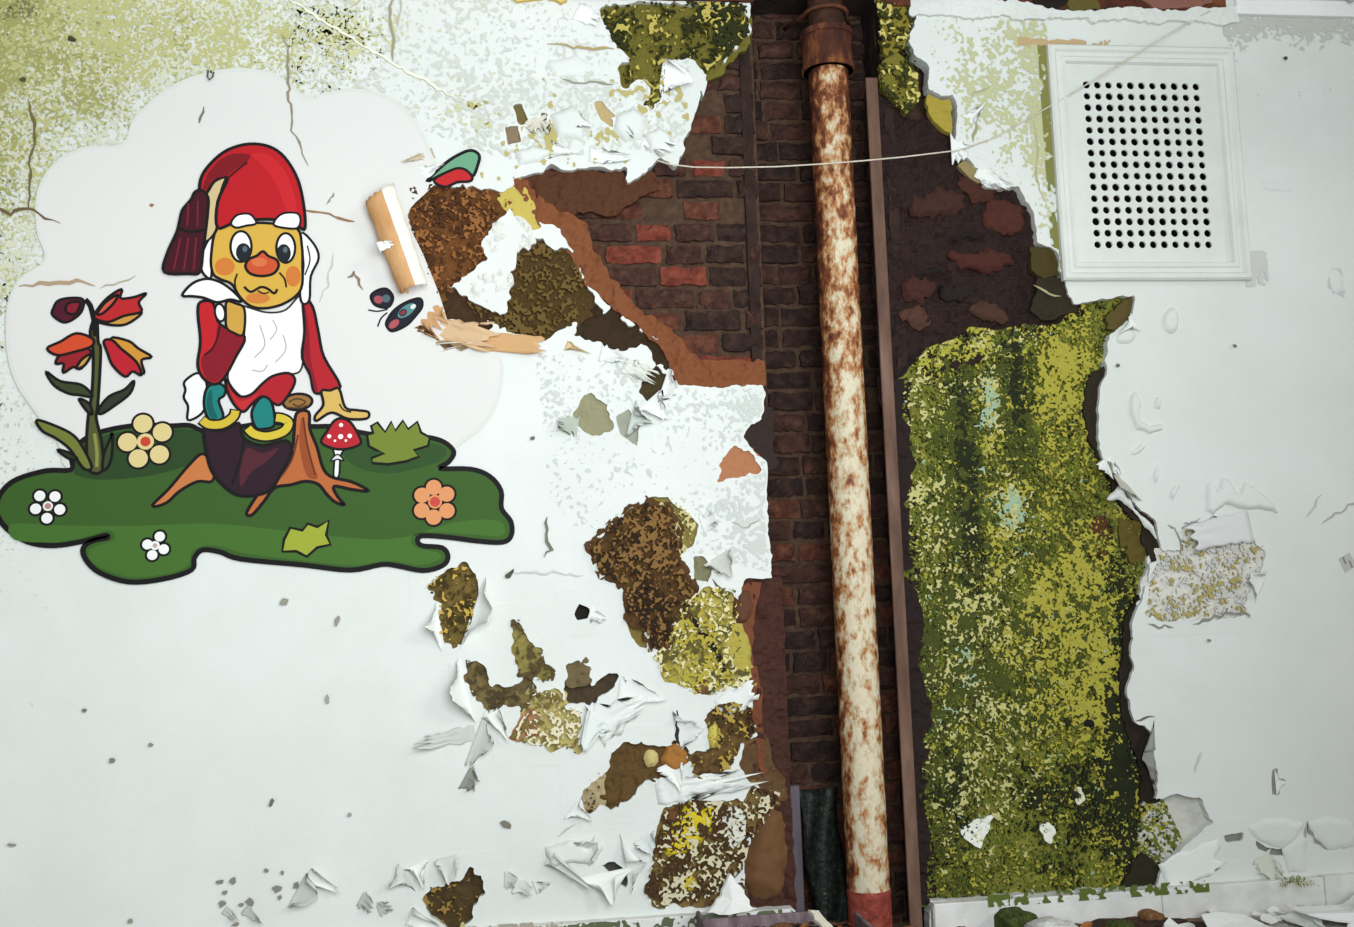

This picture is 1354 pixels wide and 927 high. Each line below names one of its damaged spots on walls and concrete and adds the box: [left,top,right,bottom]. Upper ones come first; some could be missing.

mould [0,0,46,36]
flaking render [401,3,779,483]
peeling [1120,313,1141,333]
damp [0,346,52,485]
spalling [864,0,1084,905]
peeling [1096,455,1142,501]
spalling [1088,511,1268,622]
spalling [413,495,797,912]
spalling [1064,718,1095,729]
spalling [1136,722,1354,886]
peeling [287,868,341,908]
spalling [357,854,485,927]